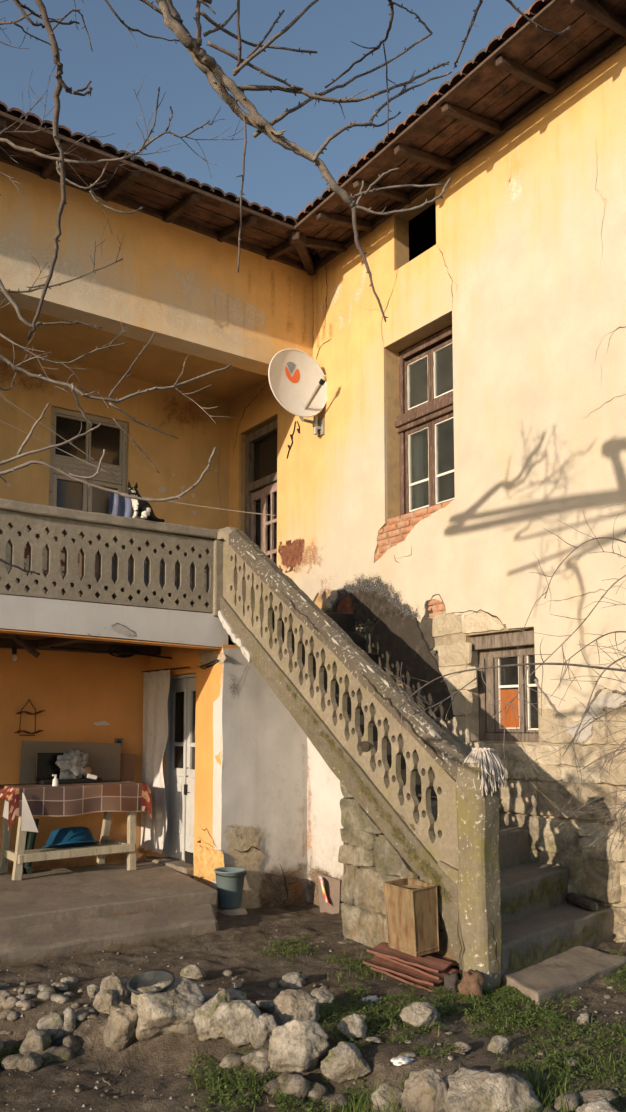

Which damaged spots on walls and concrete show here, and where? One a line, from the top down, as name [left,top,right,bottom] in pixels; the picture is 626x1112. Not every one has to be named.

crack [586,326,626,418]
peeling [0,527,79,594]
mould [329,573,420,628]
flaking render [375,500,453,560]
peeling [197,604,252,699]
flaking render [325,594,626,943]
flaking render [193,819,297,909]